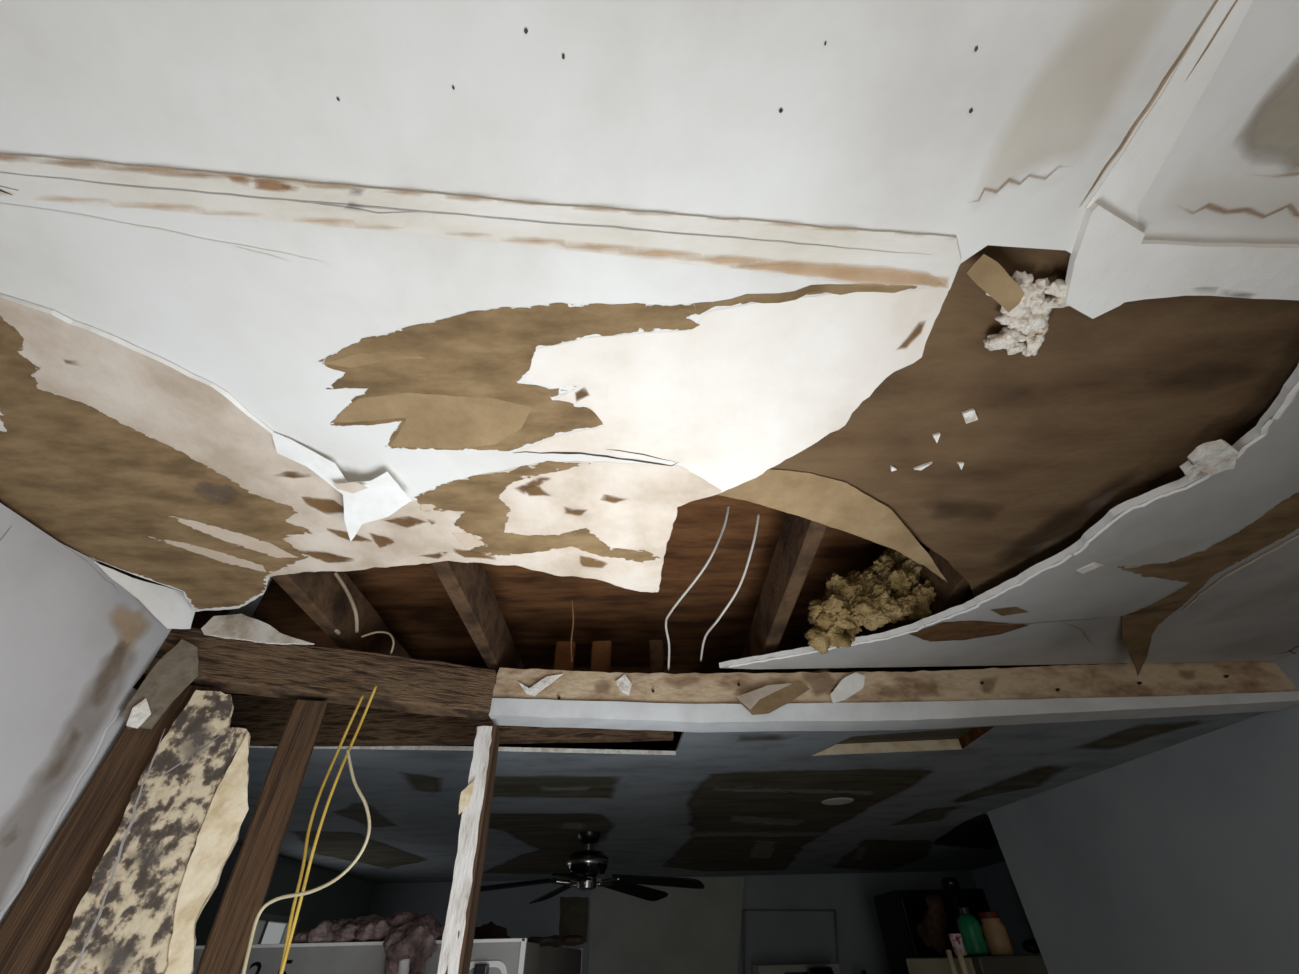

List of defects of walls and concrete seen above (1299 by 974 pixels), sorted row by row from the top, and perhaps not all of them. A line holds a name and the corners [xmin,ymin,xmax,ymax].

spalling [983,270,1069,357]
peeling [0,287,949,592]
peeling [962,408,978,424]
spalling [1179,439,1239,480]
peeling [1077,562,1104,574]
peeling [1084,721,1200,749]
peeling [407,774,440,791]
peeling [295,804,425,868]
peeling [437,726,617,974]
peeling [664,769,931,871]
peeling [834,766,1065,870]
water stain [105,949,125,972]